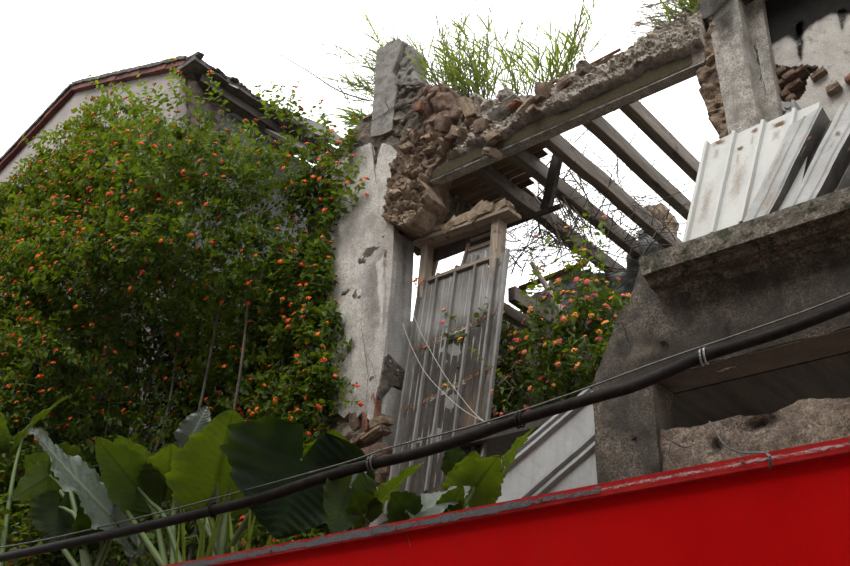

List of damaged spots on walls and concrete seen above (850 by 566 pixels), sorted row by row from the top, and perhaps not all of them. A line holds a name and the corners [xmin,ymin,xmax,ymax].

crack [754,45,766,95]
spalling [775,64,819,102]
flaking render [349,354,405,459]
peeling [724,443,849,469]